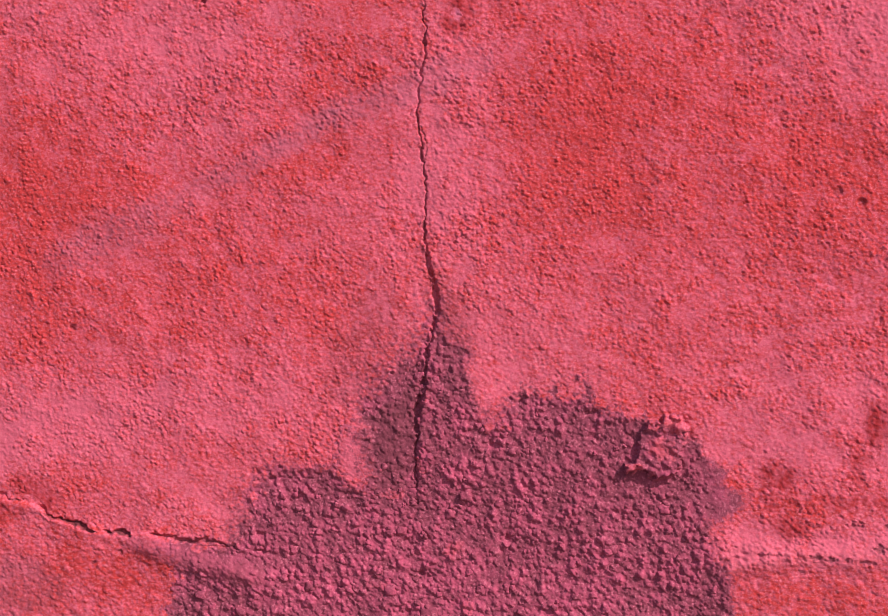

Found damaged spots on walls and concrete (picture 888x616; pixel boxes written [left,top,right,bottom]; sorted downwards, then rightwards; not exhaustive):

crack [420,1,428,48]
crack [408,112,428,241]
damp [292,230,492,514]
crack [41,512,239,551]